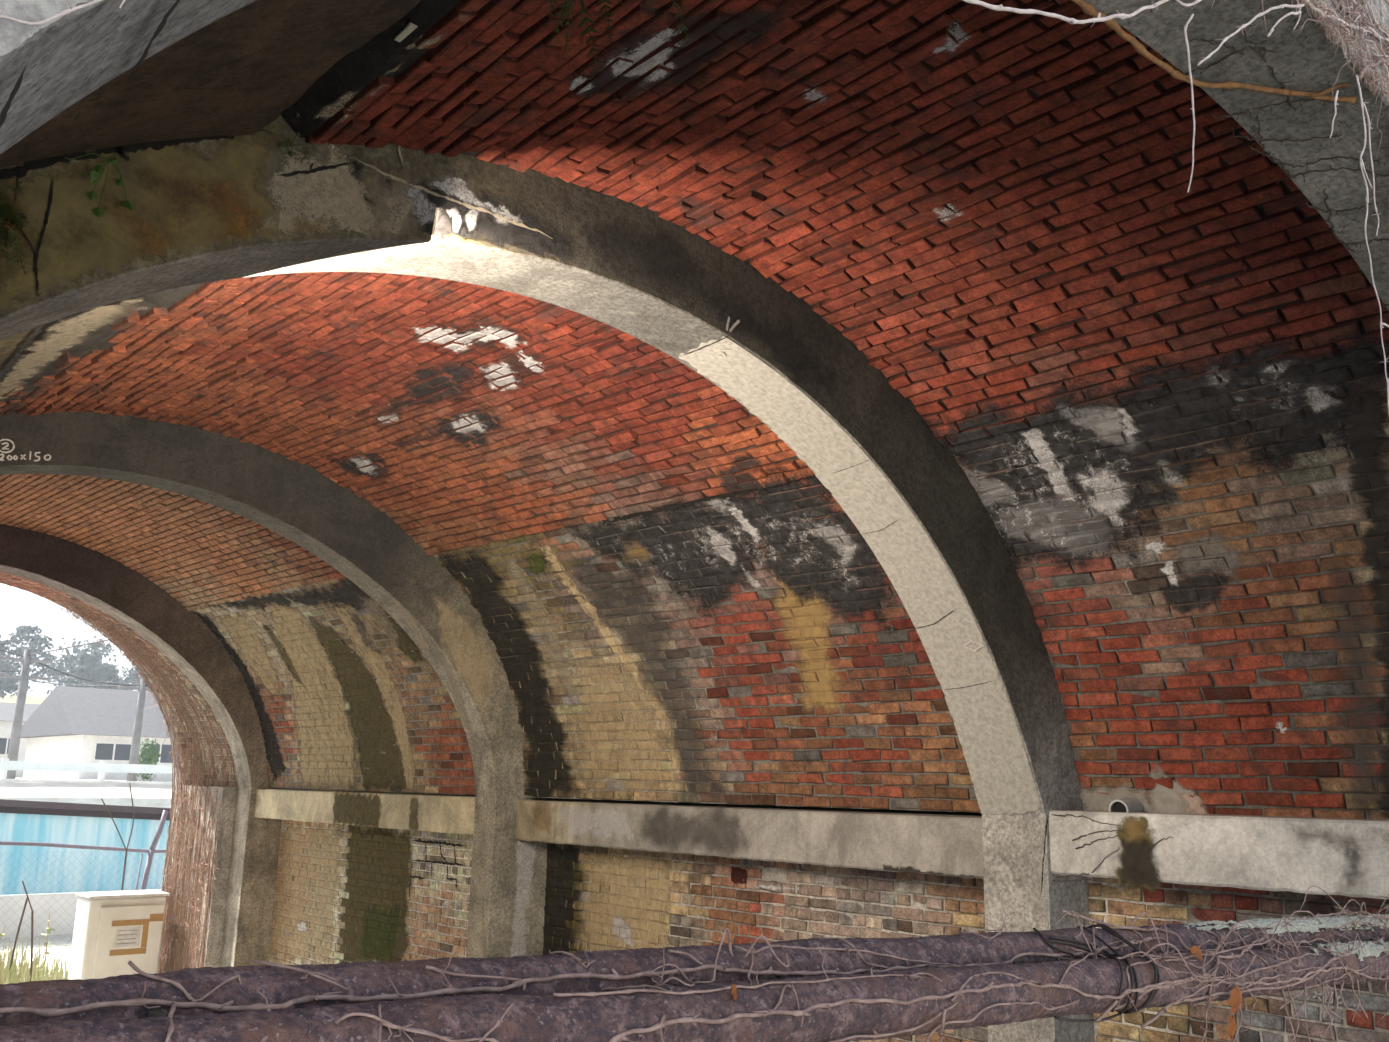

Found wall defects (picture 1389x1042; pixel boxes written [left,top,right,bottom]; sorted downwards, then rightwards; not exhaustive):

crack [0,0,272,297]
peeling [252,144,413,235]
peeling [434,177,518,244]
damp [1022,430,1126,519]
damp [709,530,734,562]
damp [729,508,759,539]
damp [1331,393,1389,819]
damp [441,545,738,955]